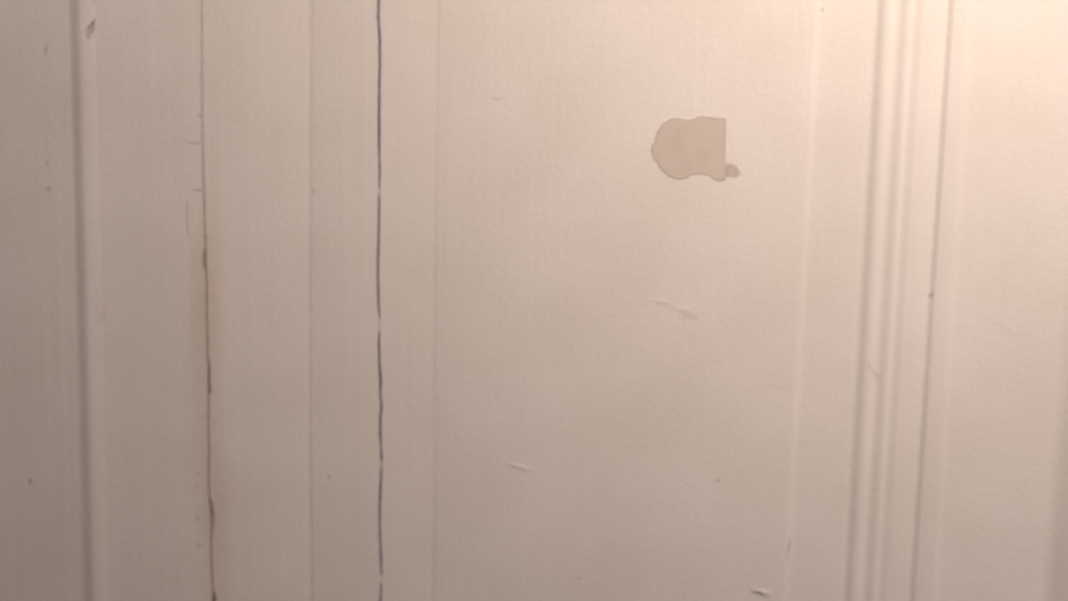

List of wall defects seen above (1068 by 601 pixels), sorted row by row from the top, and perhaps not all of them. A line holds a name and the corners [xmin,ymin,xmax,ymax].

crack [375,0,383,310]
peeling [652,117,726,181]
crack [376,336,384,601]